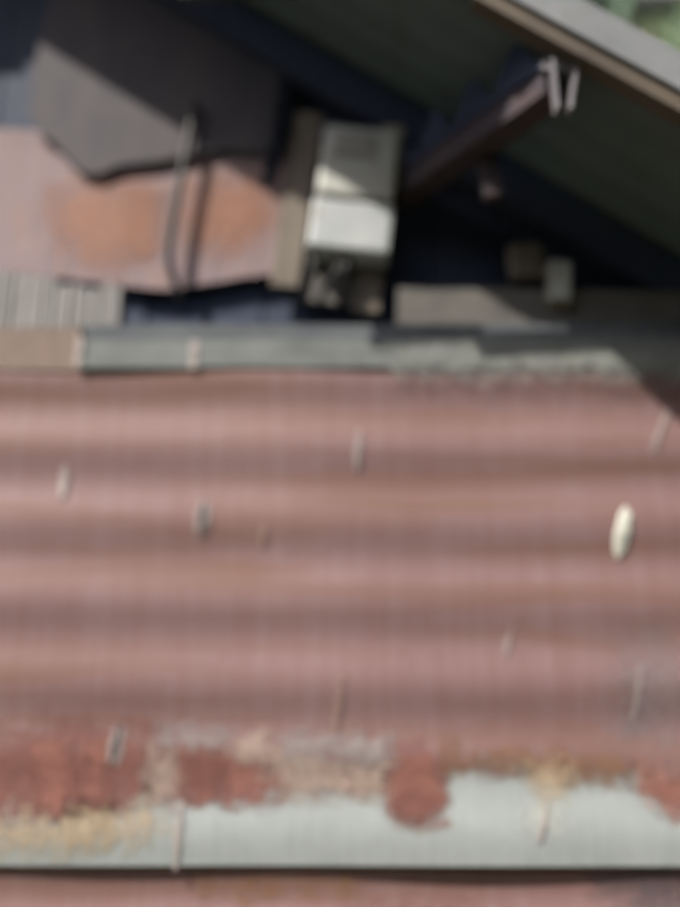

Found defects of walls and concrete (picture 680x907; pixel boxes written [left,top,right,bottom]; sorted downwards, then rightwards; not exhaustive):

peeling [0,751,680,866]